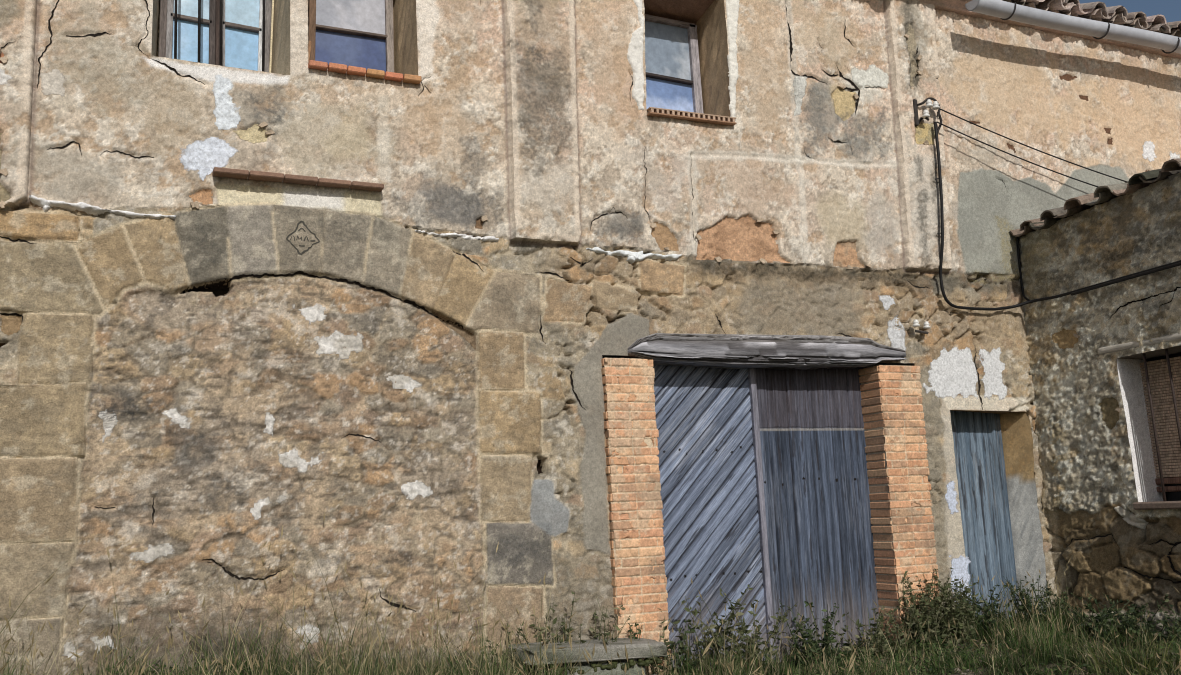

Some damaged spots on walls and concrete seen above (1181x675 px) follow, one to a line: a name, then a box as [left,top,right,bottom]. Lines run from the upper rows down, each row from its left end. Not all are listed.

crack [37,0,109,88]
crack [137,0,204,84]
crack [785,3,881,115]
spalling [0,133,11,209]
crack [47,141,153,159]
spalling [650,222,679,251]
spalling [695,214,790,264]
spalling [833,240,872,269]
crack [1111,287,1181,317]